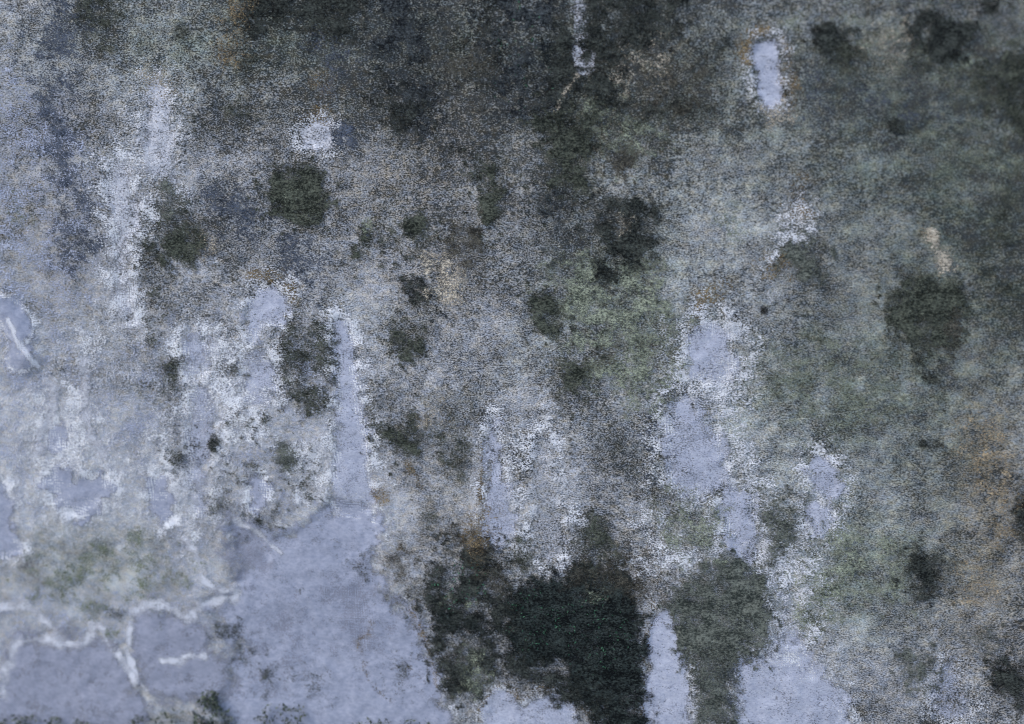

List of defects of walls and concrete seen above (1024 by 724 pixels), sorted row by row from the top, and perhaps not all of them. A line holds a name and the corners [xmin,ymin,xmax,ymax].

crack [0,600,66,643]
crack [115,622,208,692]
damp [0,0,347,724]
damp [156,0,736,421]
damp [346,314,824,724]
damp [869,160,1024,455]